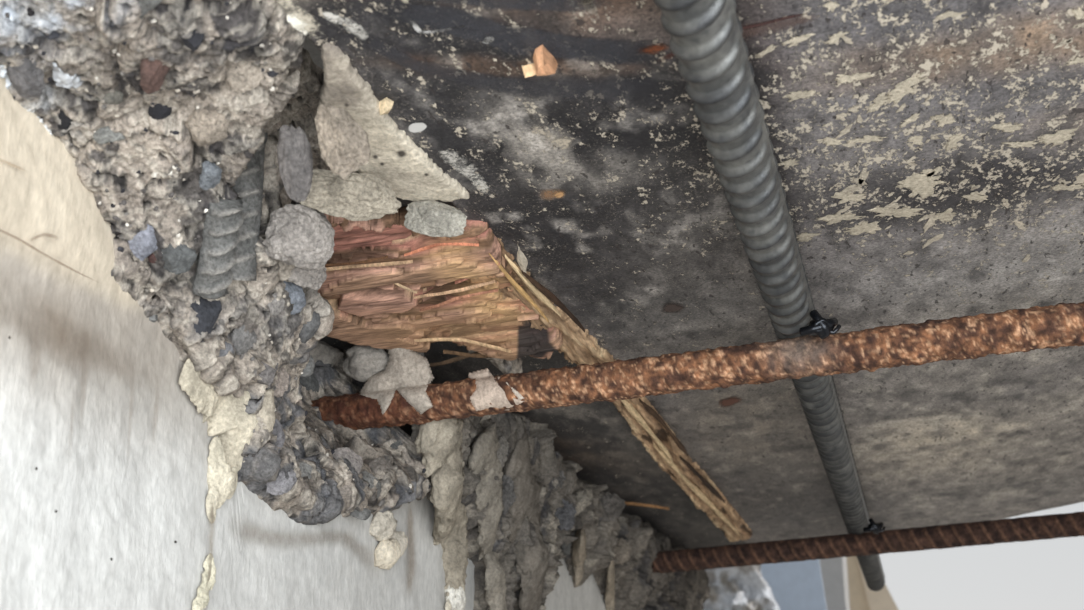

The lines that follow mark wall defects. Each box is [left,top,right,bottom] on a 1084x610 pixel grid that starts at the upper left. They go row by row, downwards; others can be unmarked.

leakage [323,12,642,100]
leakage [401,0,641,64]
peeling [756,31,867,58]
peeling [817,1,839,17]
peeling [932,5,966,22]
peeling [1025,7,1084,80]
leakage [532,127,570,149]
peeling [778,158,800,167]
peeling [782,56,1084,255]
spalling [0,0,467,525]
spalling [468,350,523,374]
spalling [461,412,780,610]